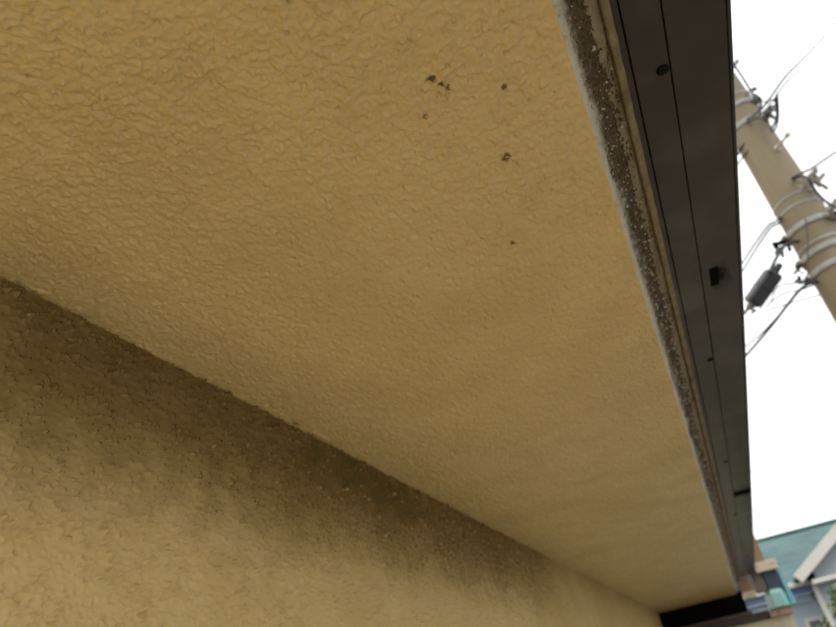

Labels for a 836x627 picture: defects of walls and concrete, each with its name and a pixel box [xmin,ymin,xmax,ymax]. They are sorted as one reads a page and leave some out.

water stain [564,0,727,542]